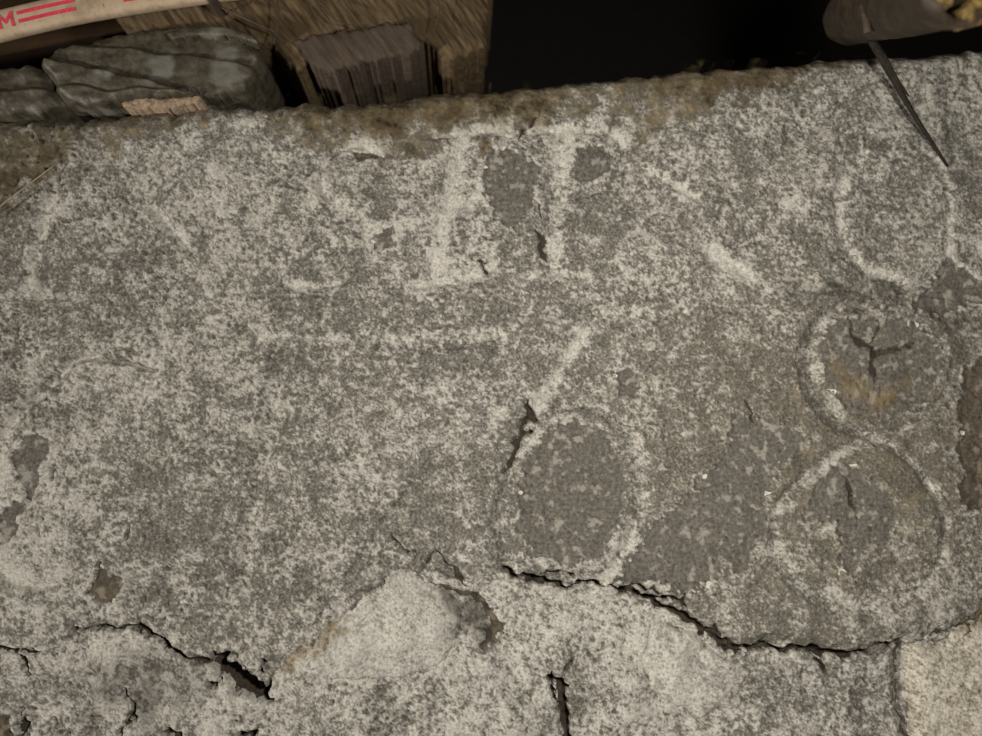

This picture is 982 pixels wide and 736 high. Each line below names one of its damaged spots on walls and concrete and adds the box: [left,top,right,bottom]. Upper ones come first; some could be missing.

spalling [483,0,982,95]
peeling [482,147,541,230]
peeling [571,144,613,183]
spalling [534,230,548,262]
peeling [818,257,982,424]
peeling [611,367,641,397]
peeling [956,356,982,510]
crack [391,536,466,586]
crack [0,645,38,669]
crack [75,620,214,663]
crack [502,565,981,736]